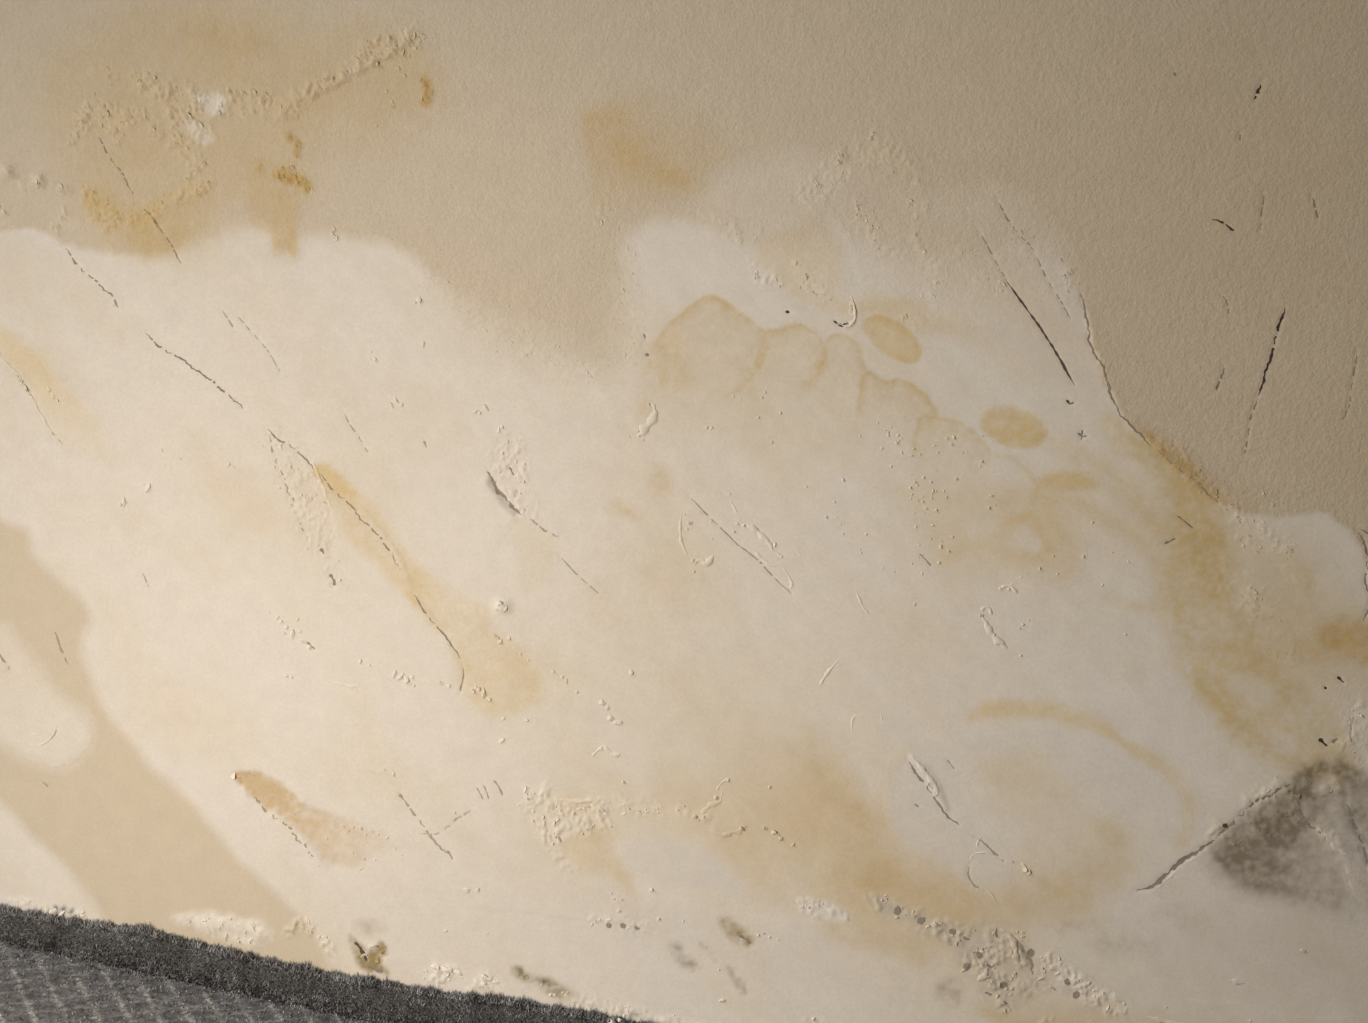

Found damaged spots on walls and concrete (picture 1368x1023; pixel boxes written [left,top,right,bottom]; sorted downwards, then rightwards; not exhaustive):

flaking render [684,140,927,294]
crack [1,225,242,408]
crack [269,430,464,691]
leakage [321,458,548,729]
flaking render [0,175,1276,1023]
leakage [629,291,1368,929]
peeling [1146,432,1368,610]
leakage [561,720,1149,1003]
flaking render [861,827,1368,1023]
crack [1137,784,1290,890]
flaking render [1203,760,1353,855]
peeling [1333,671,1368,781]